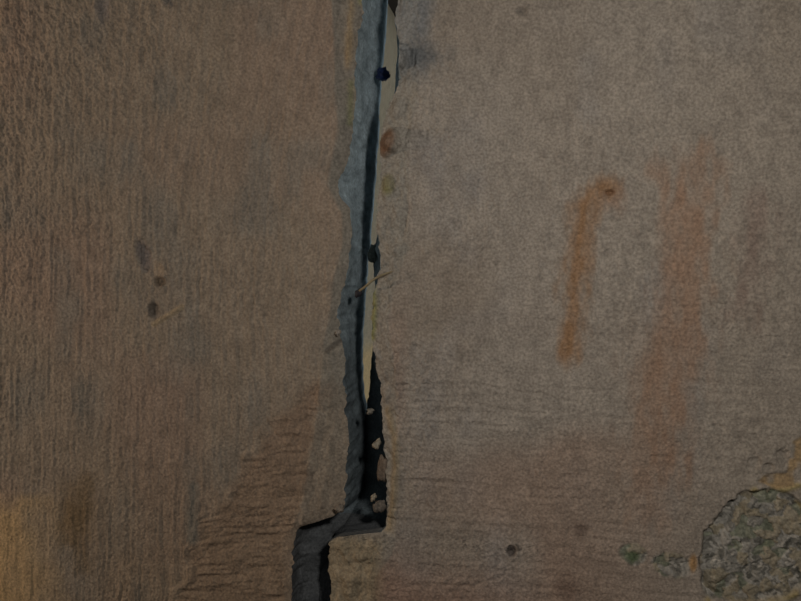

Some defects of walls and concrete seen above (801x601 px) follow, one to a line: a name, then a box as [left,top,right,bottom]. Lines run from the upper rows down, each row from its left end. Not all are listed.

crack [288,0,419,601]
spalling [613,485,801,601]